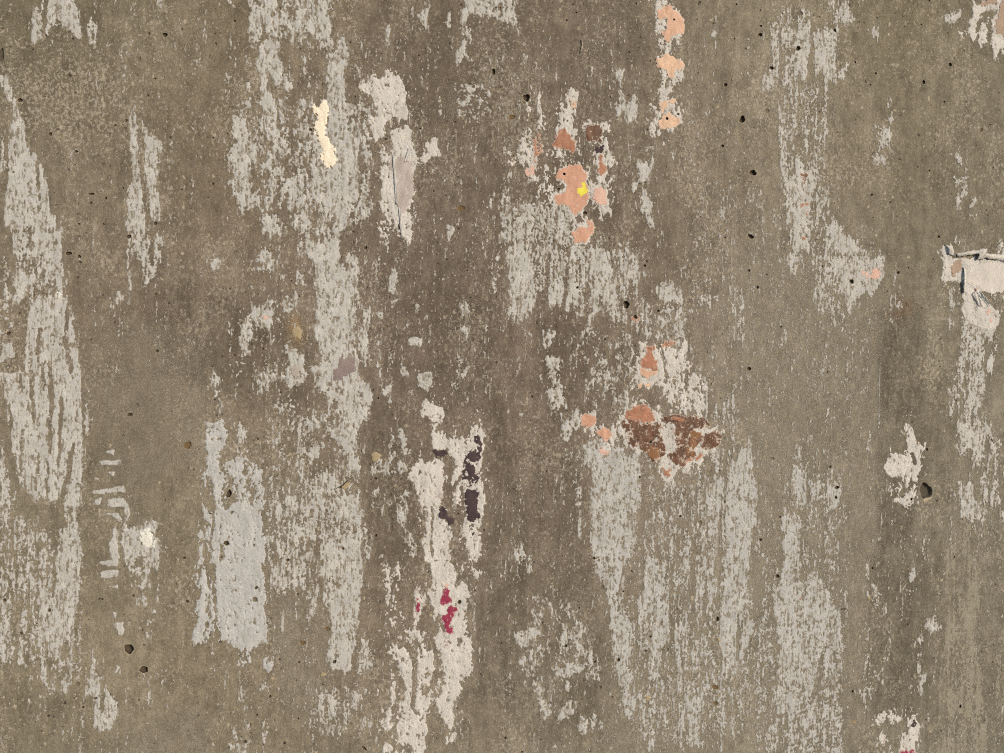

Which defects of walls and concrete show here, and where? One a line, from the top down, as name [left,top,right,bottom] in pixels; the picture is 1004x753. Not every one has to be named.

peeling [953,145,981,221]
peeling [941,0,1004,64]
peeling [0,0,210,753]
peeling [191,0,949,753]
peeling [941,282,1004,584]